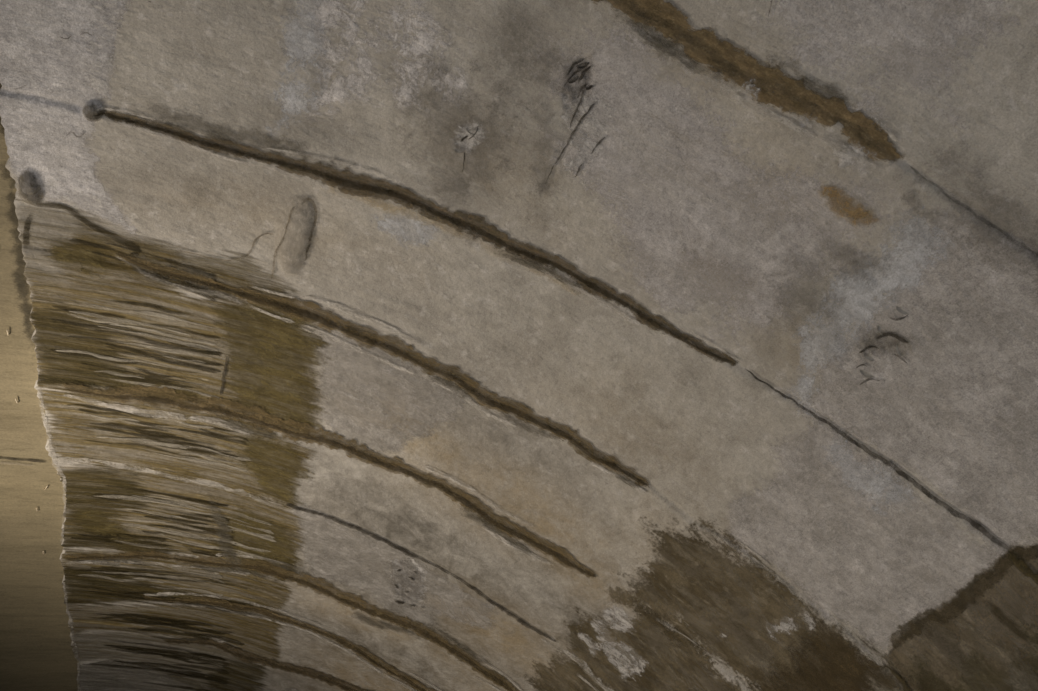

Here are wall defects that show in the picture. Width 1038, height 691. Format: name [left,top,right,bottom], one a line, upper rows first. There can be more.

water stain [273,0,467,122]
crack [547,68,605,179]
rust [592,0,903,168]
water stain [0,0,228,411]
crack [180,198,317,275]
crack [911,167,1038,256]
water stain [528,27,1038,691]
water stain [39,394,273,511]
water stain [62,487,276,560]
crack [287,504,556,642]
crack [747,370,1038,584]
water stain [63,579,244,691]